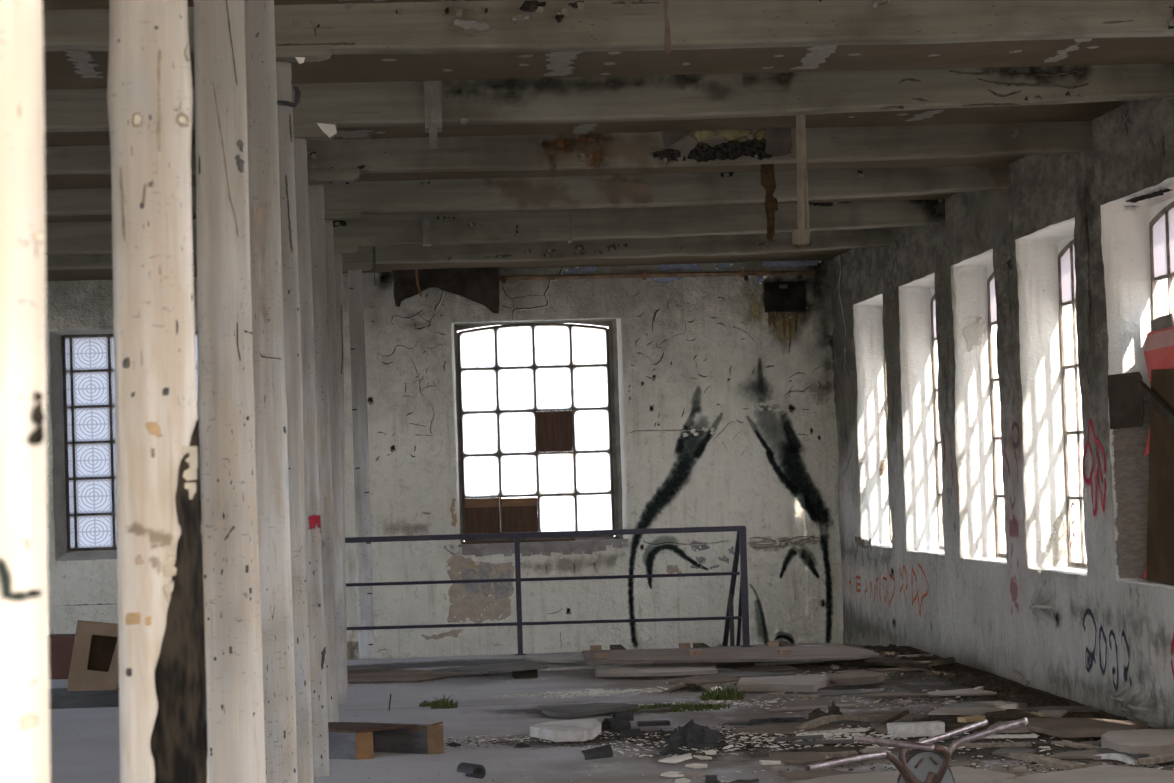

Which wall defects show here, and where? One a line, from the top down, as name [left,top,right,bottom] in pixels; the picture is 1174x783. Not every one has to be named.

damp [454,78,642,100]
damp [982,65,1090,85]
crack [502,267,565,319]
crack [377,290,446,436]
peeling [421,555,515,640]